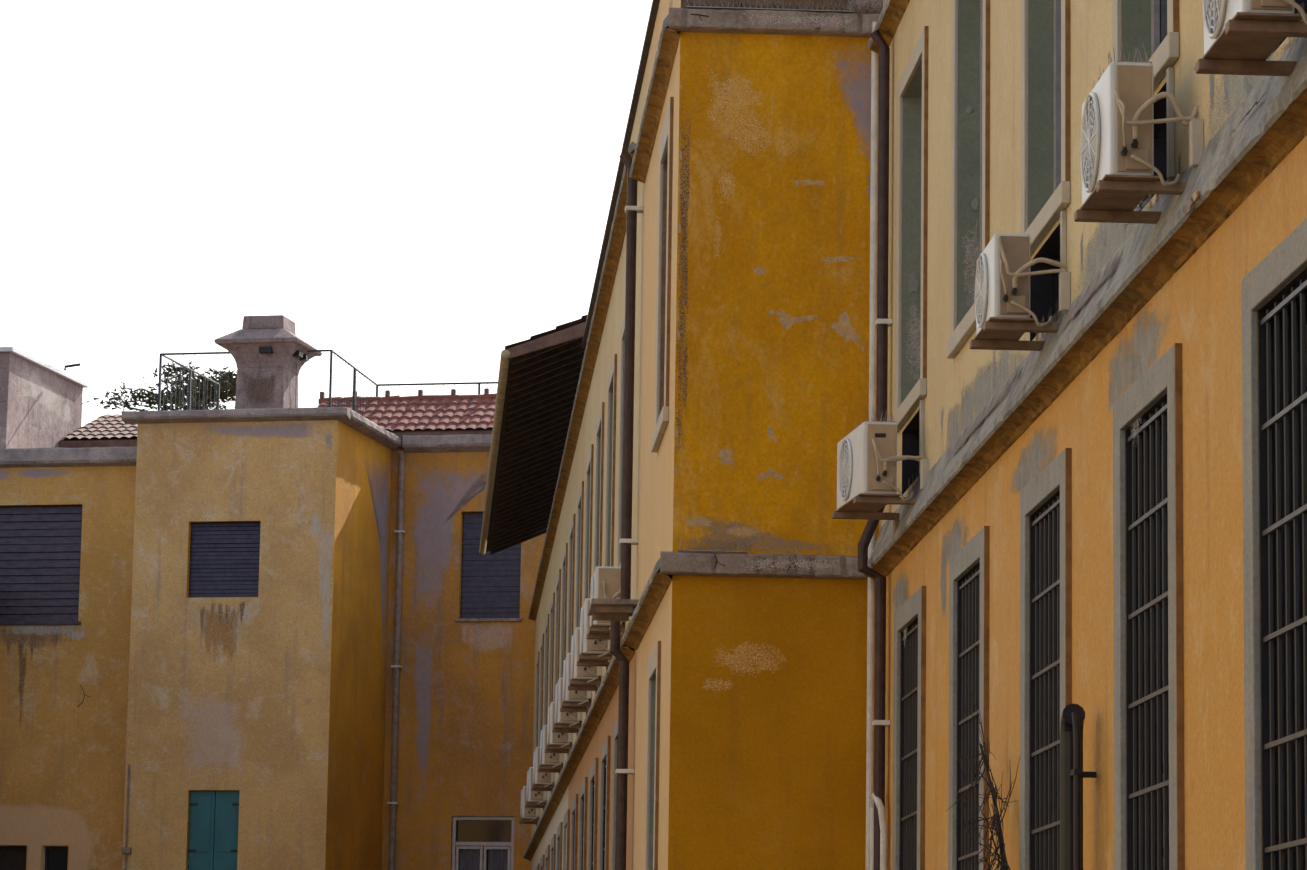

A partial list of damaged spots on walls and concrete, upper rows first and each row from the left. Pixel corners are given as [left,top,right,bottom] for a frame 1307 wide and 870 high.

peeling [706,61,797,159]
damp [0,624,86,727]